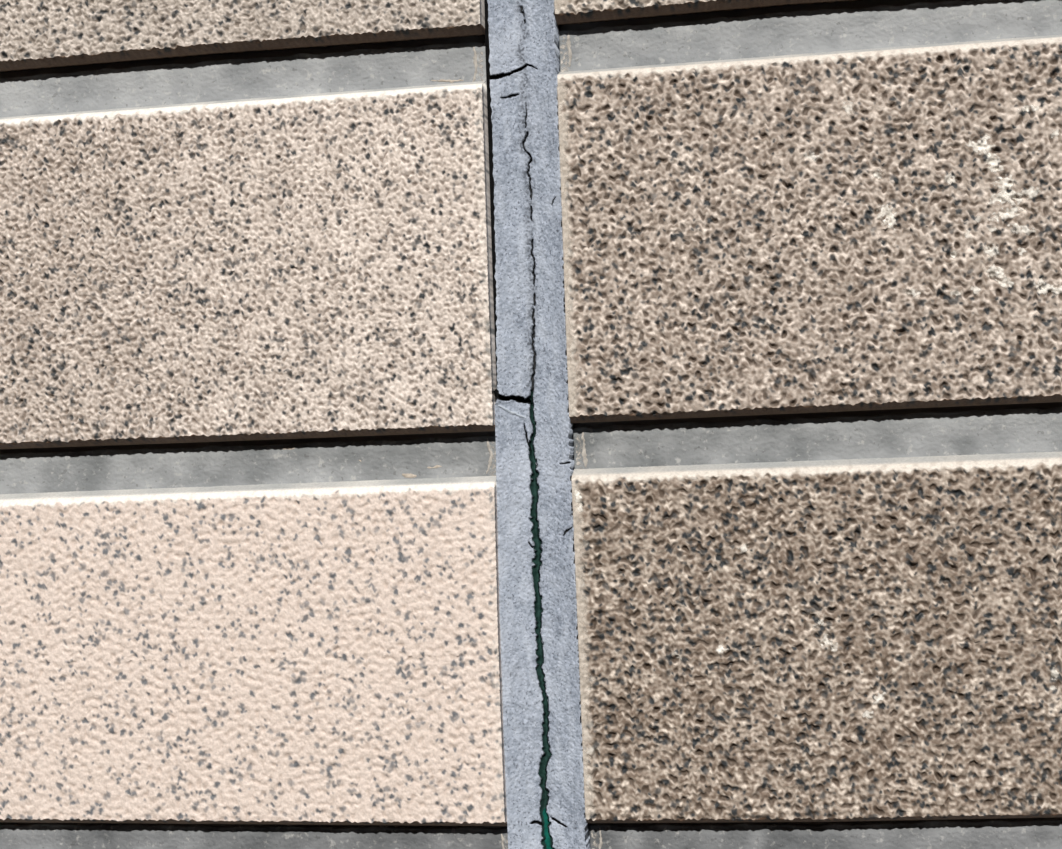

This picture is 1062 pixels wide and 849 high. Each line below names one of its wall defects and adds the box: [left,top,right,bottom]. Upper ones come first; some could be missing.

crack [489,64,572,849]